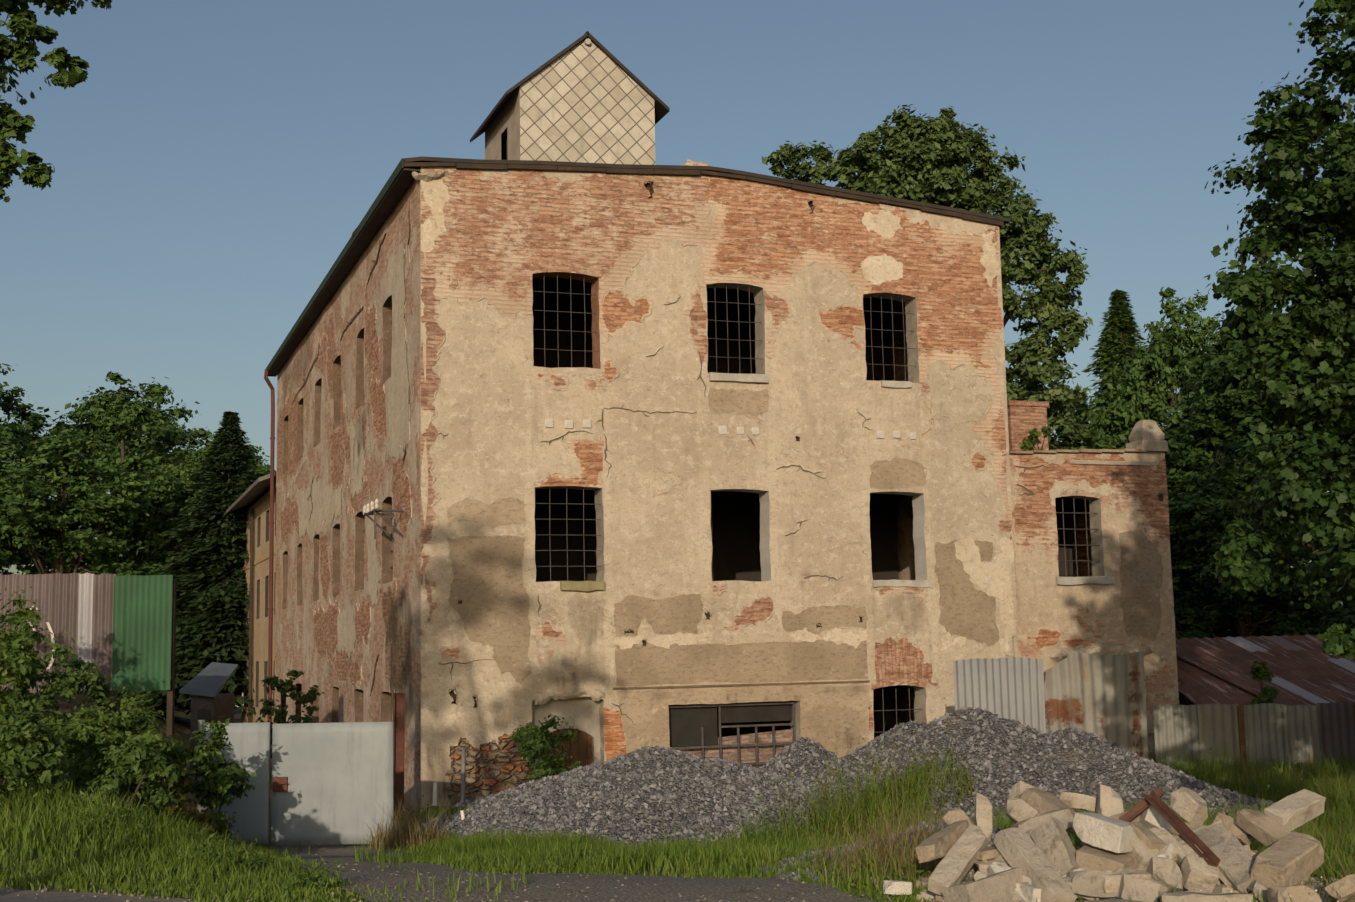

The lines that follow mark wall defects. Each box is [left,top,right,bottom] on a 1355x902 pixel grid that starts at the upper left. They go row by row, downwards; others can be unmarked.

crack [540,352,707,478]
flaking render [276,159,1176,805]
crack [747,434,826,478]
corrosion [1045,699,1083,723]
corrosion [1128,670,1142,756]